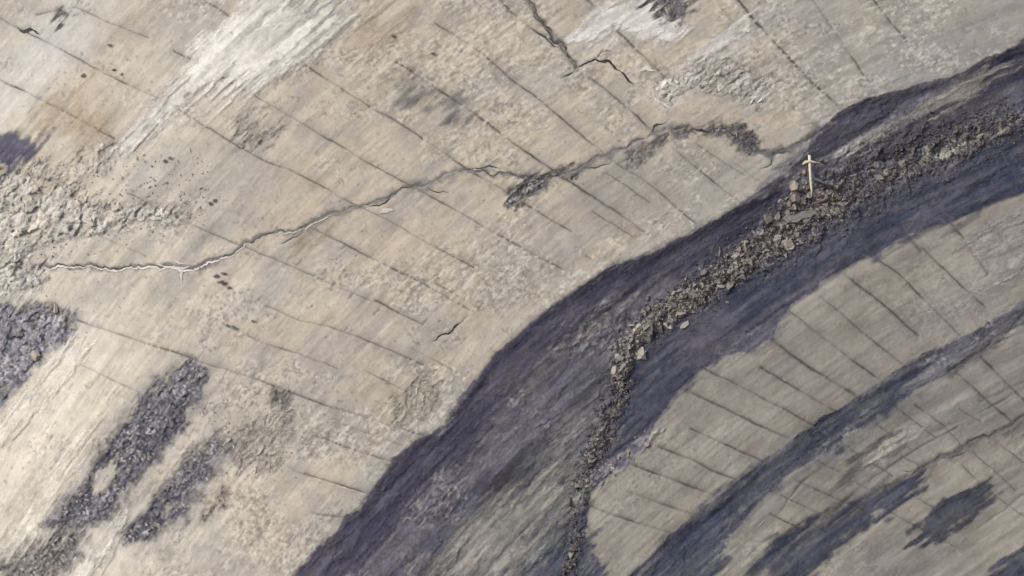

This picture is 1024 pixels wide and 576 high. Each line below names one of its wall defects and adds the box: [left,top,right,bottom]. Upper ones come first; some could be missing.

crack [527,0,635,86]
peeling [0,0,360,406]
crack [31,122,821,272]
spalling [627,123,762,168]
spalling [700,170,846,288]
spalling [611,289,697,378]
spalling [0,358,208,576]
spalling [119,390,294,545]